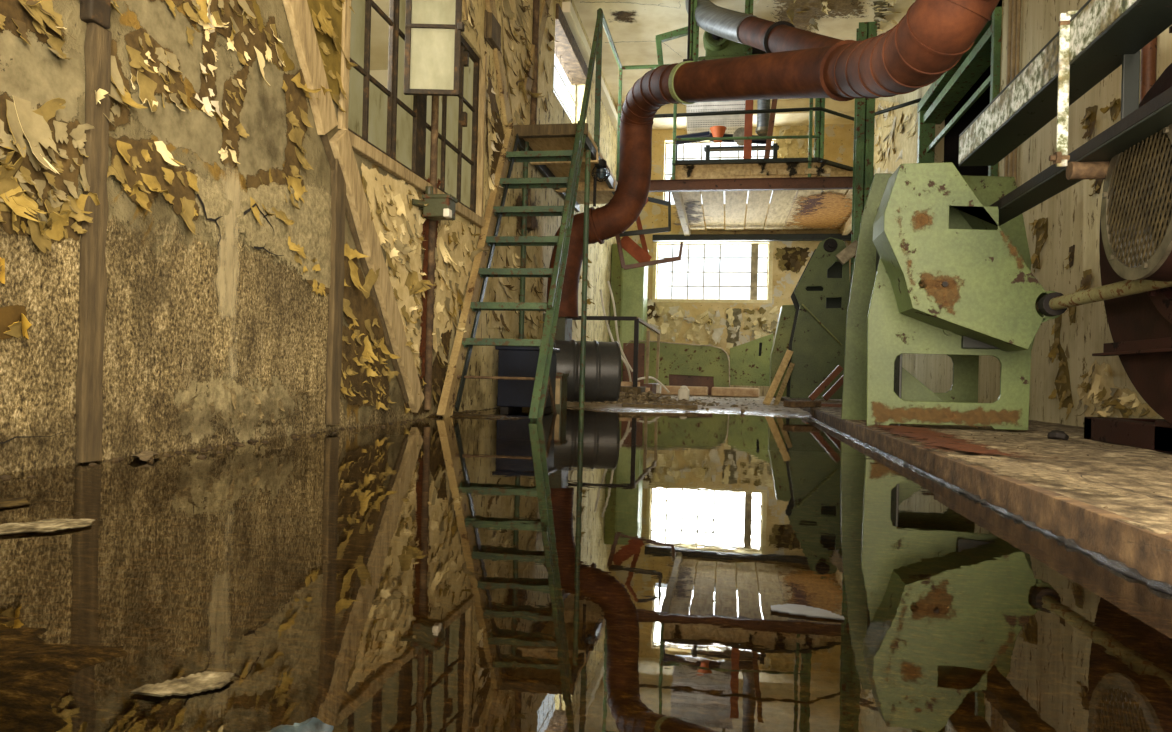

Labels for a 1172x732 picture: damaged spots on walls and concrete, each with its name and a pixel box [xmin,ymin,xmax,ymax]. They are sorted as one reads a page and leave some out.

peeling [462,0,561,197]
peeling [1080,98,1121,140]
peeling [0,0,544,416]
peeling [1089,179,1104,196]
peeling [1030,217,1048,273]
peeling [1065,245,1092,292]
peeling [1046,306,1157,420]